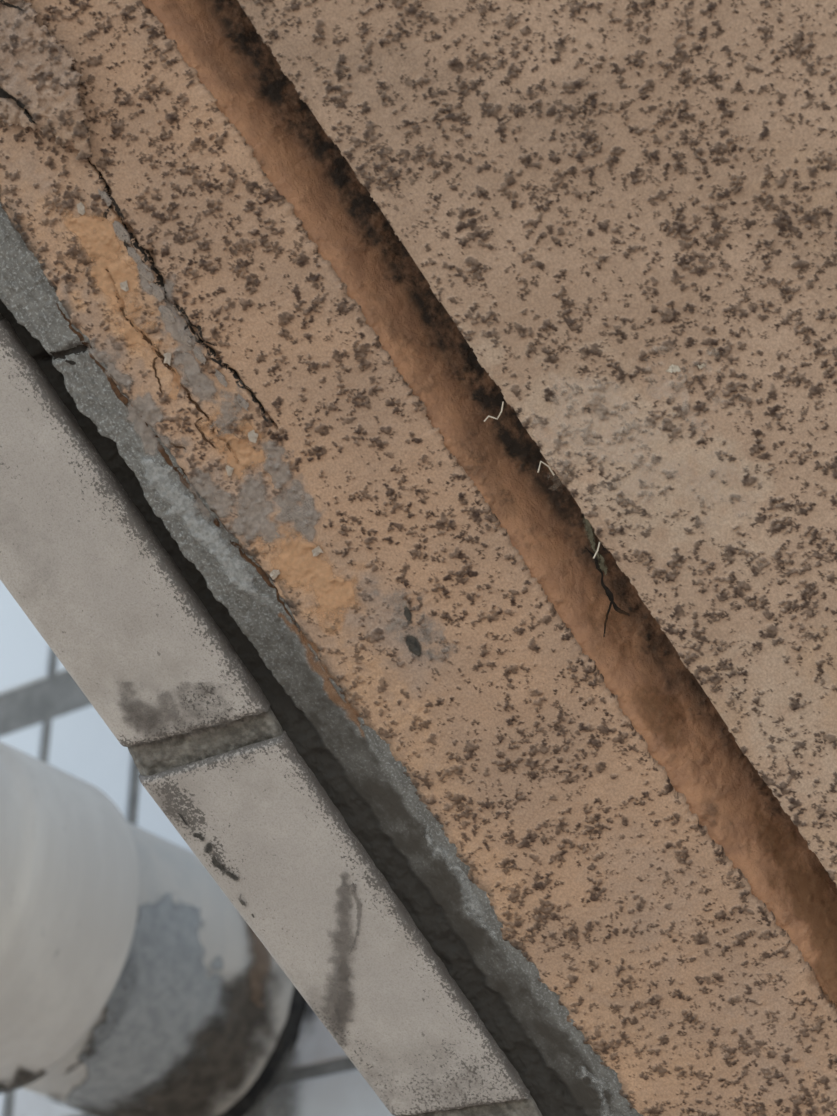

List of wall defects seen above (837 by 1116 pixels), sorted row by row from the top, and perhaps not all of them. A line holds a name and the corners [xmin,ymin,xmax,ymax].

peeling [0,0,93,162]
crack [42,159,304,637]
leakage [302,876,362,1046]